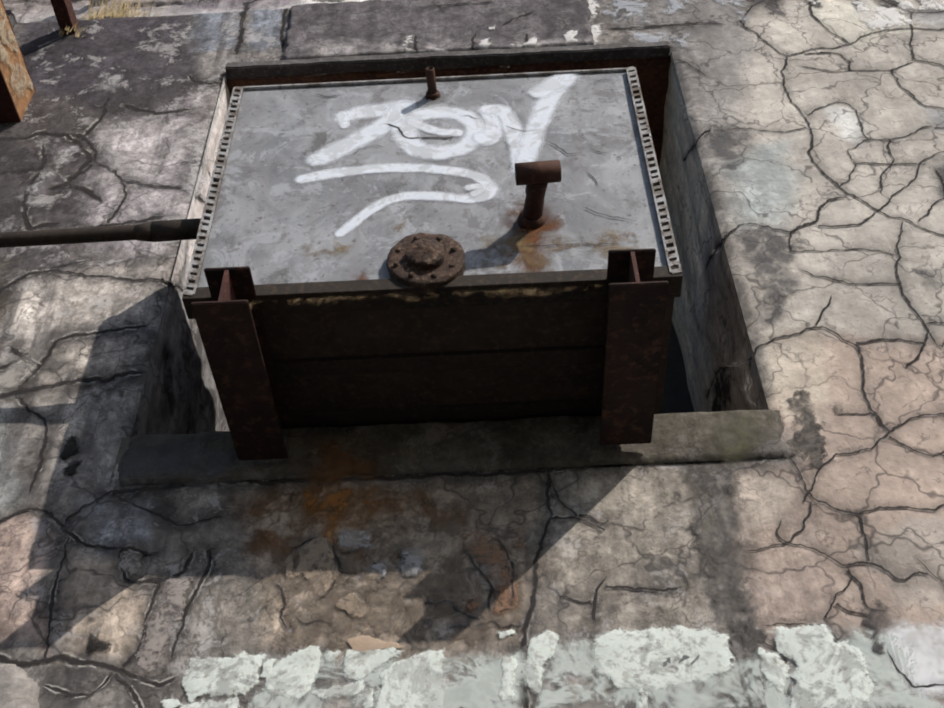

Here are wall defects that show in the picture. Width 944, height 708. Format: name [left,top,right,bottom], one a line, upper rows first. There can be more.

crack [189,76,225,86]
crack [0,98,205,230]
crack [0,259,183,291]
rust [488,213,572,272]
crack [0,324,147,493]
crack [337,0,944,708]
spalling [683,466,740,578]
crack [0,478,322,708]
spalling [134,577,197,672]
crack [274,538,421,628]
spalling [161,521,944,708]